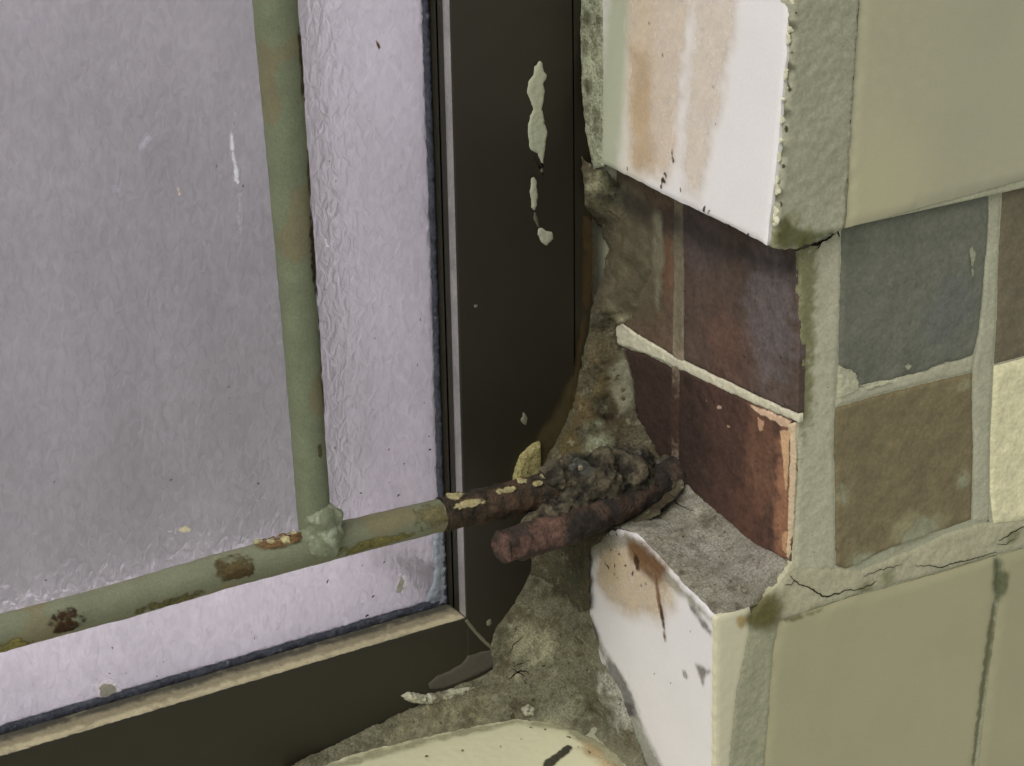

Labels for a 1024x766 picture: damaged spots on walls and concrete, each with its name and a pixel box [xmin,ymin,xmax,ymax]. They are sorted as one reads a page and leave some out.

corrosion [521,216,677,522]
peeling [496,474,545,495]
crack [787,527,1022,598]